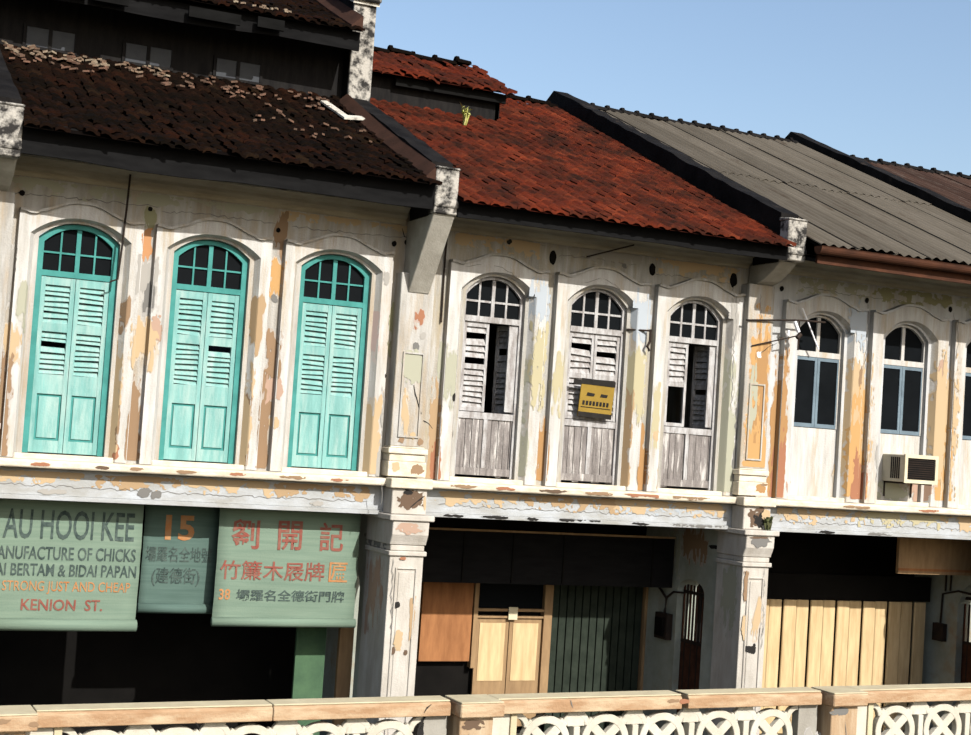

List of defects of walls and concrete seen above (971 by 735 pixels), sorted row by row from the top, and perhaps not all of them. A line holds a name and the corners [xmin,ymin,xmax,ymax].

peeling [118,254,159,372]
peeling [249,294,284,405]